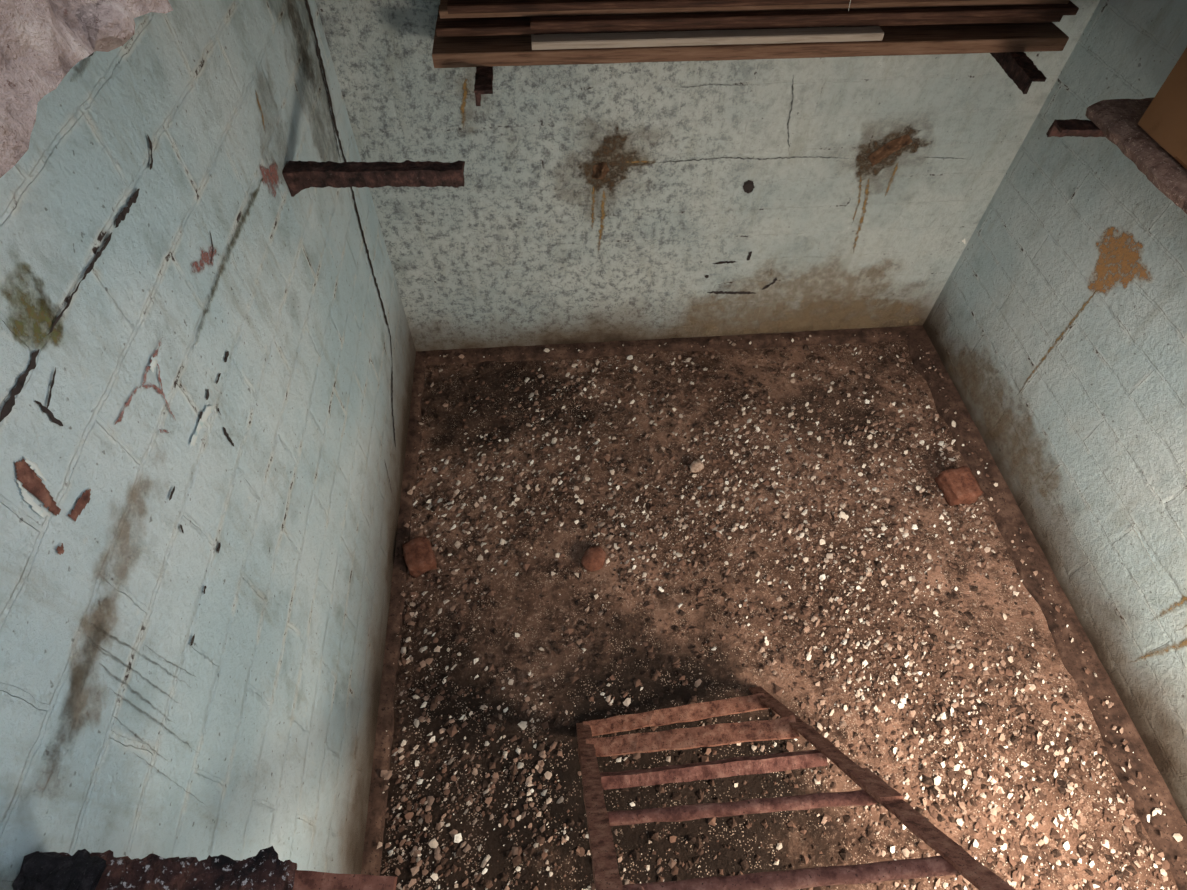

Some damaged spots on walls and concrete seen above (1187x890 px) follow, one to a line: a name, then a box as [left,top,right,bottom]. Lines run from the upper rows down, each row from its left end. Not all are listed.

corrosion [260,163,279,196]
corrosion [579,127,656,250]
corrosion [853,125,927,247]
water stain [33,277,62,329]
crack [0,134,153,426]
corrosion [1020,227,1150,391]
peeling [15,457,91,522]
corrosion [1131,625,1187,662]